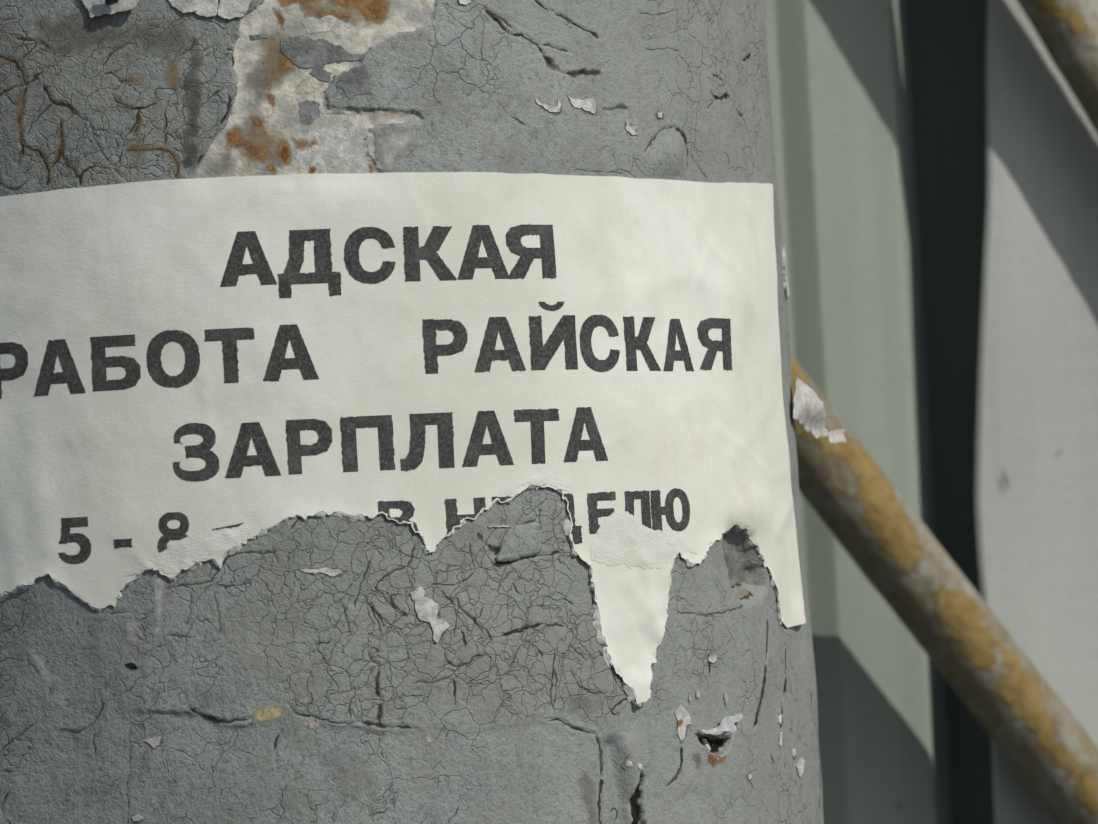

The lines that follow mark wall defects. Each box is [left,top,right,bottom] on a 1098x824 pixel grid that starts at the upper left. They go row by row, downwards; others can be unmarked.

crack [485,0,600,77]
crack [0,17,204,190]
crack [211,48,234,124]
peeling [169,0,435,178]
peeling [535,95,596,114]
crack [708,75,743,116]
crack [173,549,279,637]
crack [293,546,415,729]
crack [414,509,628,824]
crack [190,707,248,723]
spalling [674,689,743,764]
crack [668,747,683,785]